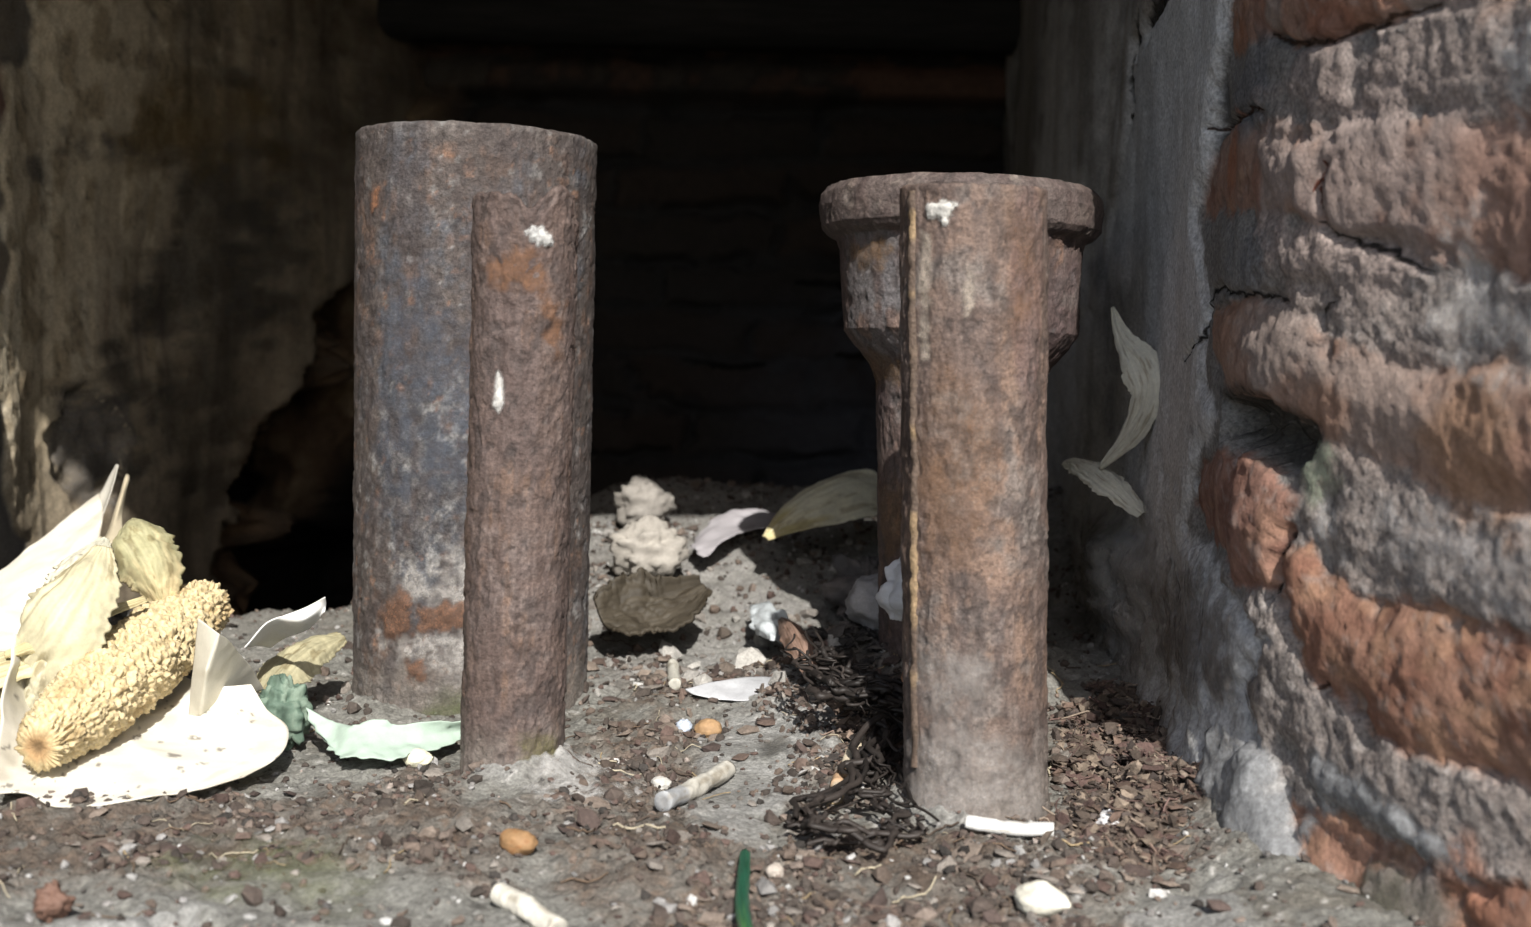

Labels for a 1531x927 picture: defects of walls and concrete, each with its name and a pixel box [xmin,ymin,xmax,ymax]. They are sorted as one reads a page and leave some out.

crack [1313,160,1435,276]
corrosion [381,589,464,638]